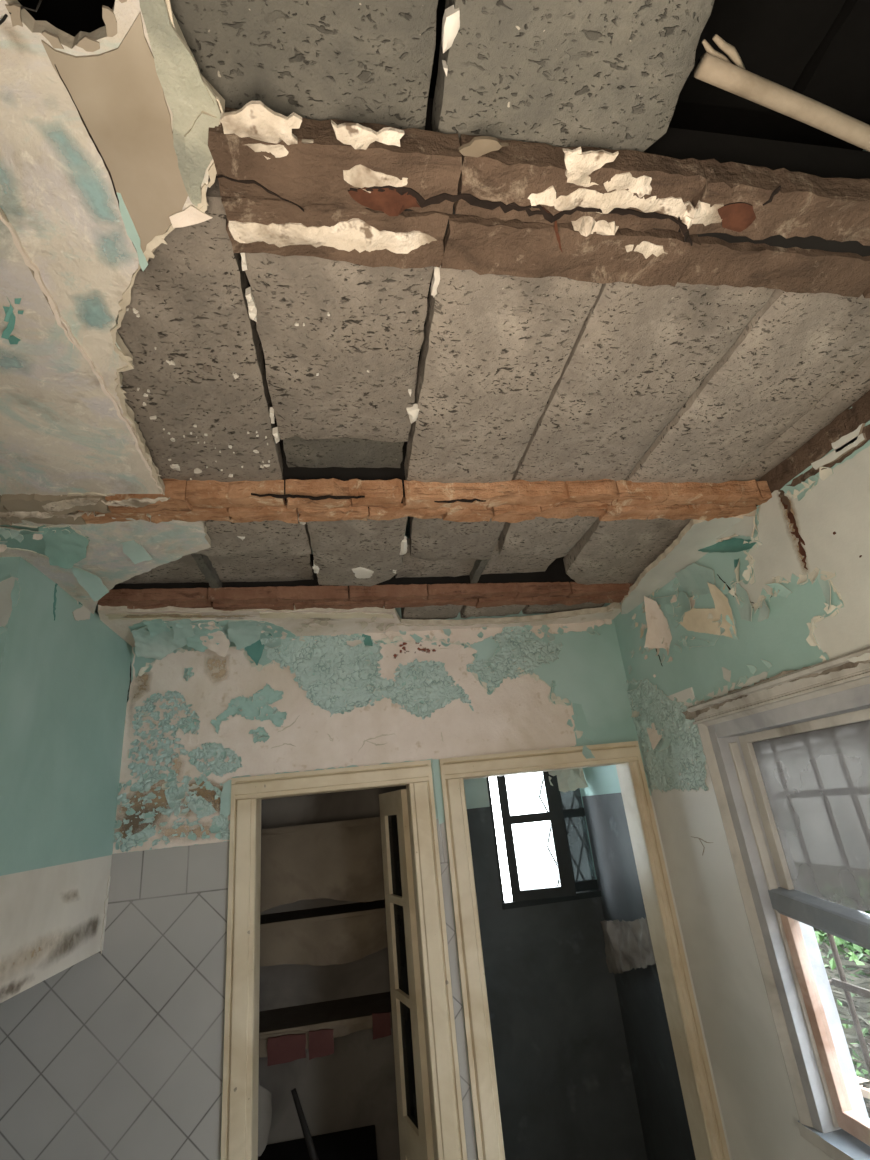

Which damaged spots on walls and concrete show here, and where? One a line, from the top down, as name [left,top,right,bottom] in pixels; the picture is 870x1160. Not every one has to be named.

peeling [331,120,404,150]
crack [216,175,304,212]
peeling [228,218,437,254]
crack [348,185,692,252]
peeling [527,147,724,237]
crack [718,185,781,232]
flaking render [0,0,314,621]
crack [251,492,365,500]
crack [434,496,486,504]
peeling [627,390,870,720]
peeling [105,610,613,854]
water stain [60,921,97,953]